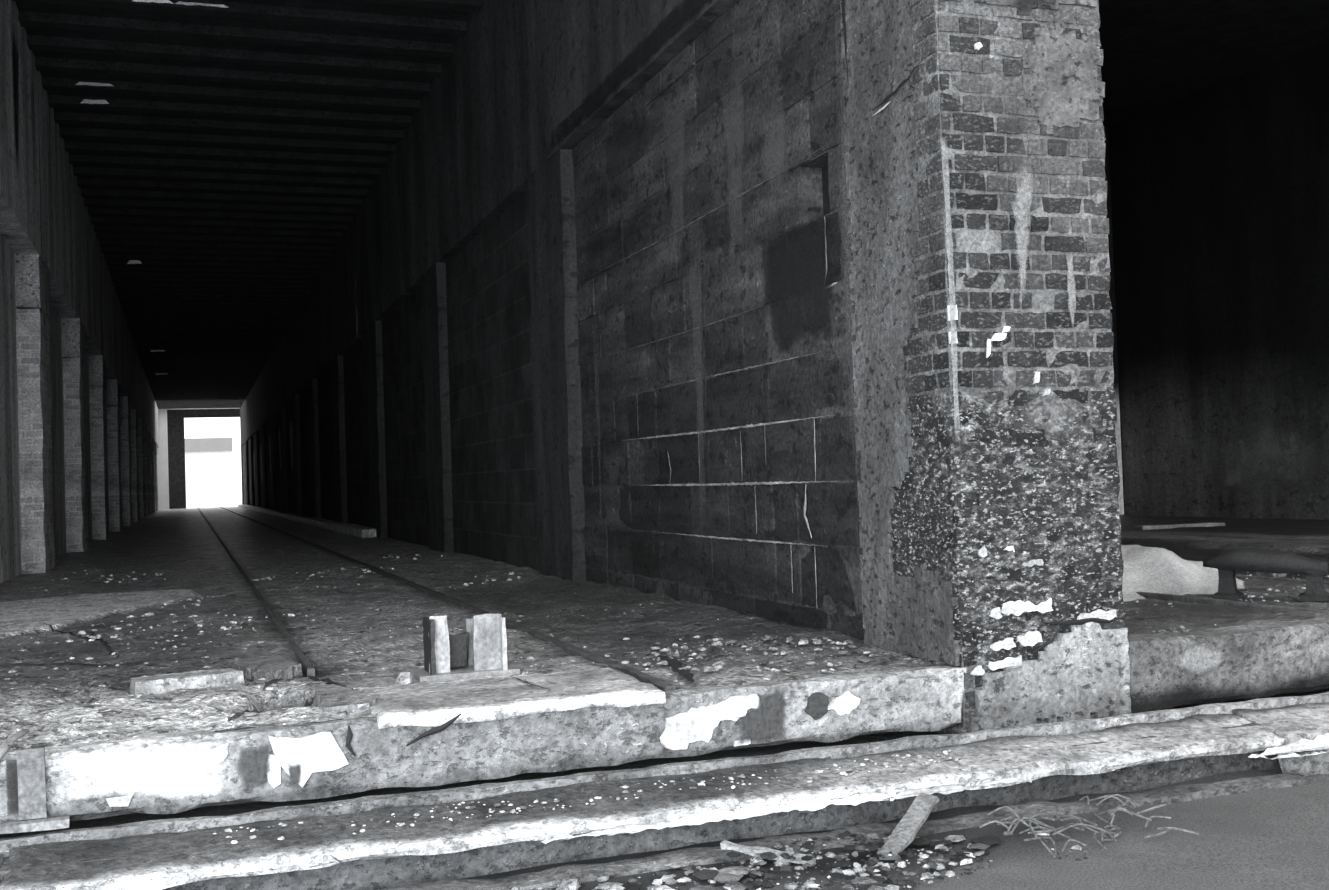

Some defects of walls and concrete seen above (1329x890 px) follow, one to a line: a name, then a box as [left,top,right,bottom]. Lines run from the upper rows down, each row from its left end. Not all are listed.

spalling [1004,546,1044,567]
spalling [989,598,1053,619]
spalling [1077,609,1117,620]
spalling [970,630,1043,675]
peeling [660,693,759,750]
spalling [804,691,860,720]
peeling [57,743,229,807]
peeling [267,732,349,788]